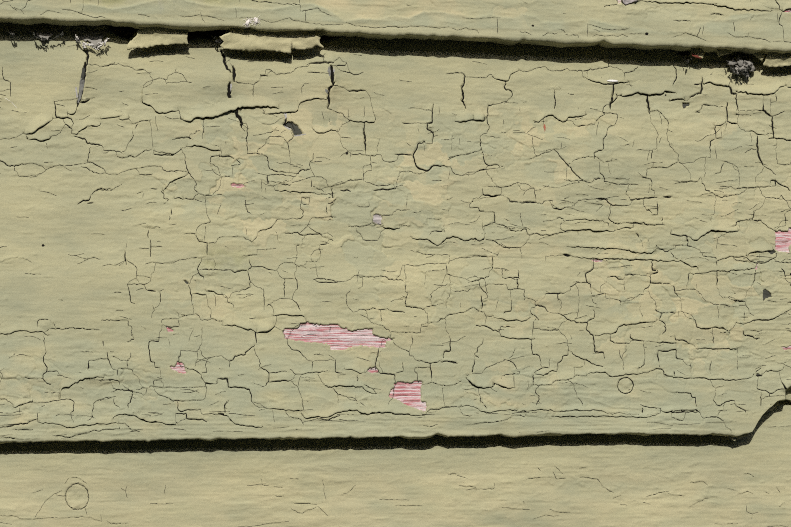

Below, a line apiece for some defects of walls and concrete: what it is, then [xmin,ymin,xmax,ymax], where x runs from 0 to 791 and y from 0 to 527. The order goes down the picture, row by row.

crack [1,0,105,18]
peeling [109,25,342,54]
crack [604,0,791,55]
spalling [768,228,791,254]
spalling [283,322,394,350]
spalling [389,381,426,412]